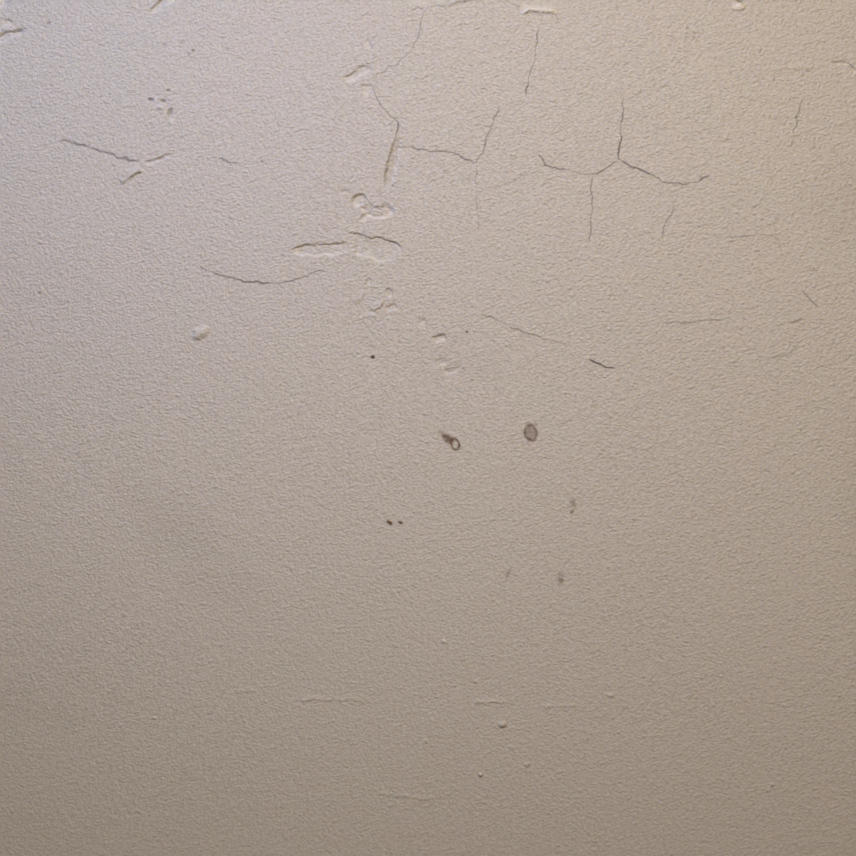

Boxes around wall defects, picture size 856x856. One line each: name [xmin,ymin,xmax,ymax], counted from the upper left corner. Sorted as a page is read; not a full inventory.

crack [330,35,388,102]
crack [51,136,178,192]
crack [382,122,409,201]
spalling [277,228,423,278]